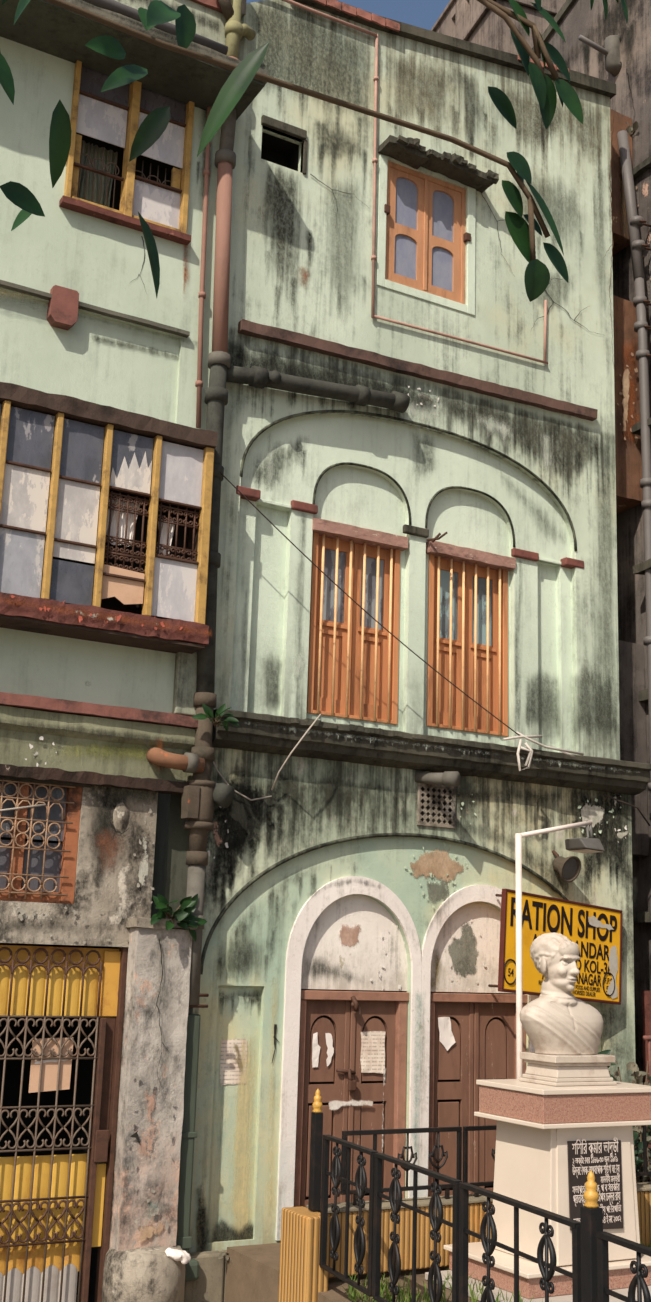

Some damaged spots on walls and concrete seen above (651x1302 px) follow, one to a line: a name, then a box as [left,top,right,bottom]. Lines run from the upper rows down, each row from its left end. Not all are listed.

leakage [459,72,493,154]
leakage [510,93,599,158]
crack [531,69,635,364]
leakage [228,344,602,482]
leakage [574,490,616,733]
leakage [516,665,558,723]
leakage [204,774,380,908]
peeling [404,842,468,908]
peeling [578,796,631,843]
leakage [219,913,266,971]
peeling [340,925,361,947]
crack [153,940,171,1105]